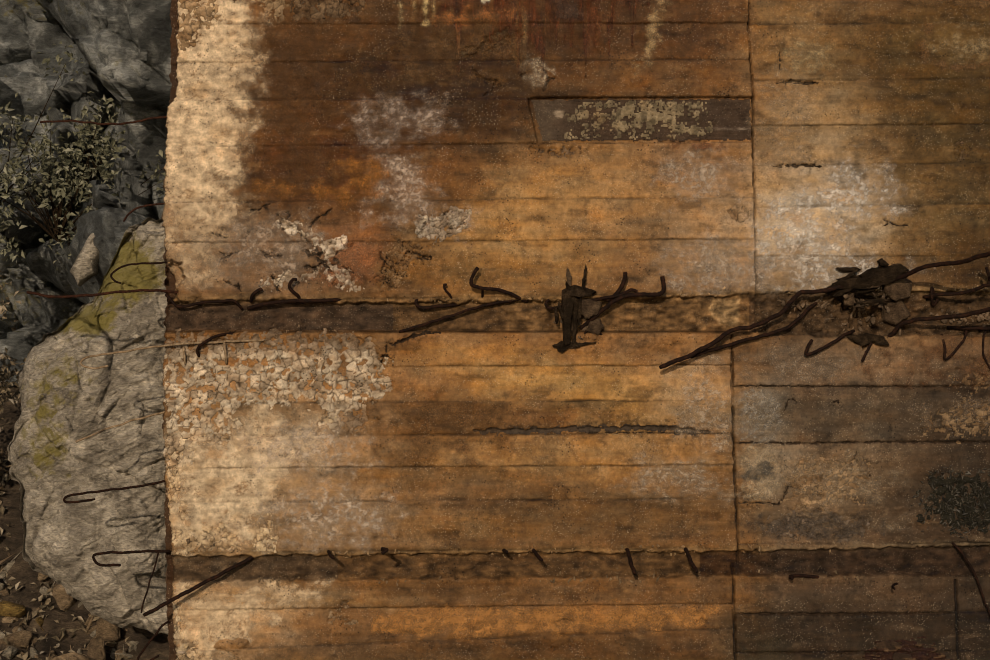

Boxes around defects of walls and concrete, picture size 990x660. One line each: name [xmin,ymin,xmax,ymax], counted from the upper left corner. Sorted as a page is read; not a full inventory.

water stain [399,0,546,86]
water stain [163,0,324,286]
water stain [352,99,441,147]
water stain [374,157,430,234]
spalling [26,205,472,310]
spalling [580,272,666,335]
spalling [659,285,844,369]
spalling [804,329,855,356]
spalling [873,251,990,444]
spalling [63,322,394,660]